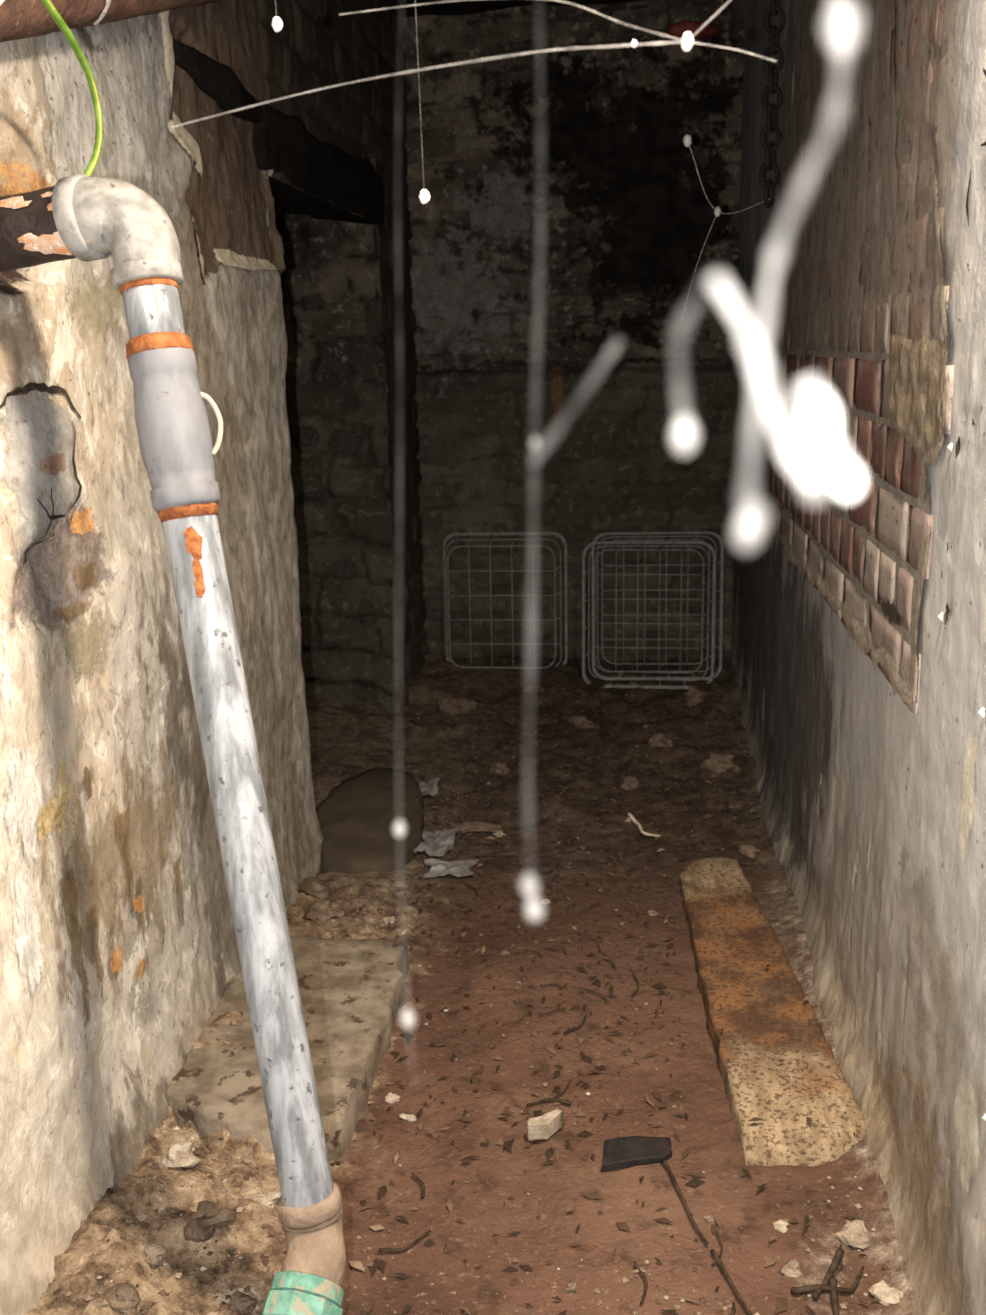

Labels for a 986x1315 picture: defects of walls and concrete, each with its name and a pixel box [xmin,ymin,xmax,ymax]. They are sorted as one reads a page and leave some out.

spalling [11,505,115,635]
flaking render [766,0,975,714]